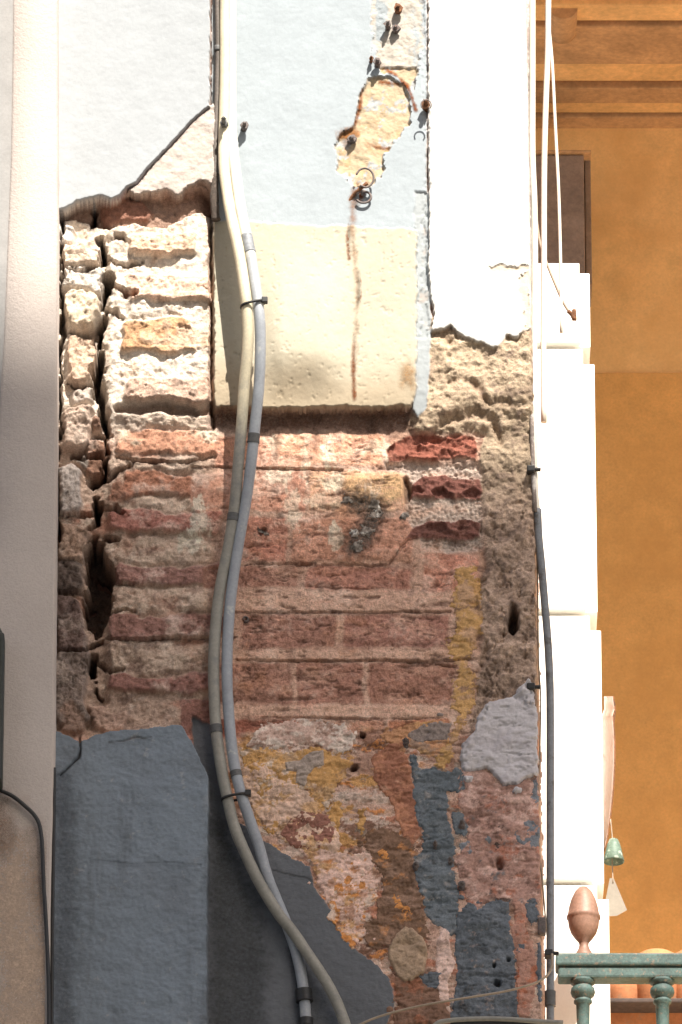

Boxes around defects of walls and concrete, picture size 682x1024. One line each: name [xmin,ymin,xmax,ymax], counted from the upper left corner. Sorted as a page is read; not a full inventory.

rust [339,95,362,139]
rust [379,69,418,111]
crack [57,106,478,703]
leakage [340,491,386,556]
spalling [56,104,546,1024]